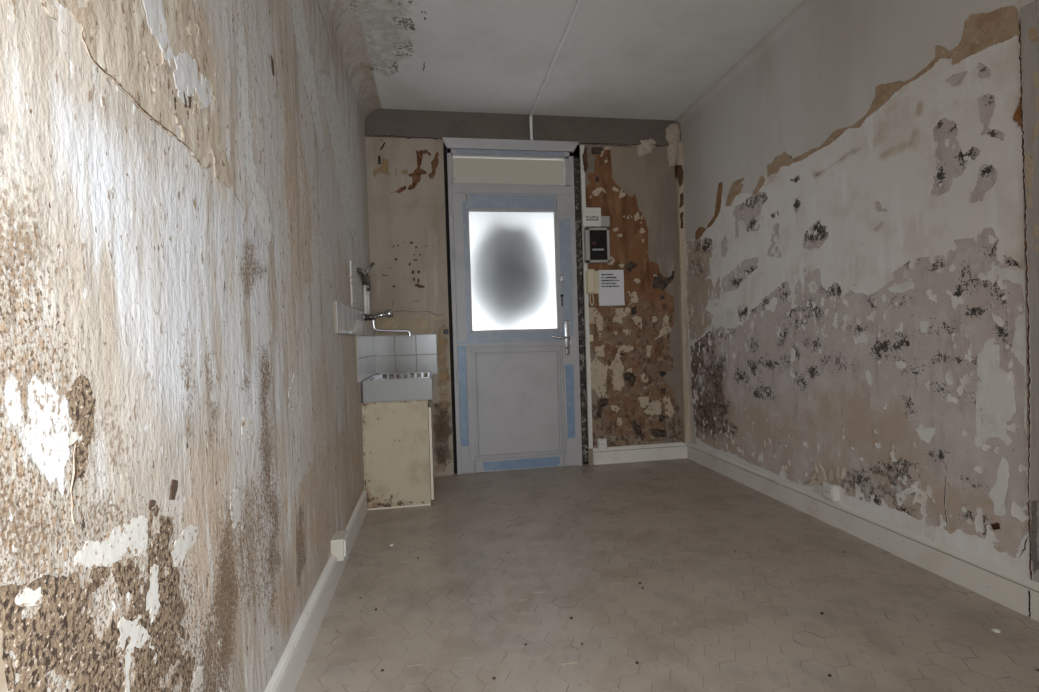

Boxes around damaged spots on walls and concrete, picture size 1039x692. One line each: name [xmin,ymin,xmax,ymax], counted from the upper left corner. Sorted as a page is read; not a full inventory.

peeling [40,0,233,188]
crack [81,28,194,153]
peeling [589,187,626,199]
peeling [613,212,645,243]
spalling [674,165,684,229]
peeling [589,278,674,426]
spalling [976,255,1027,530]
spalling [0,375,241,692]